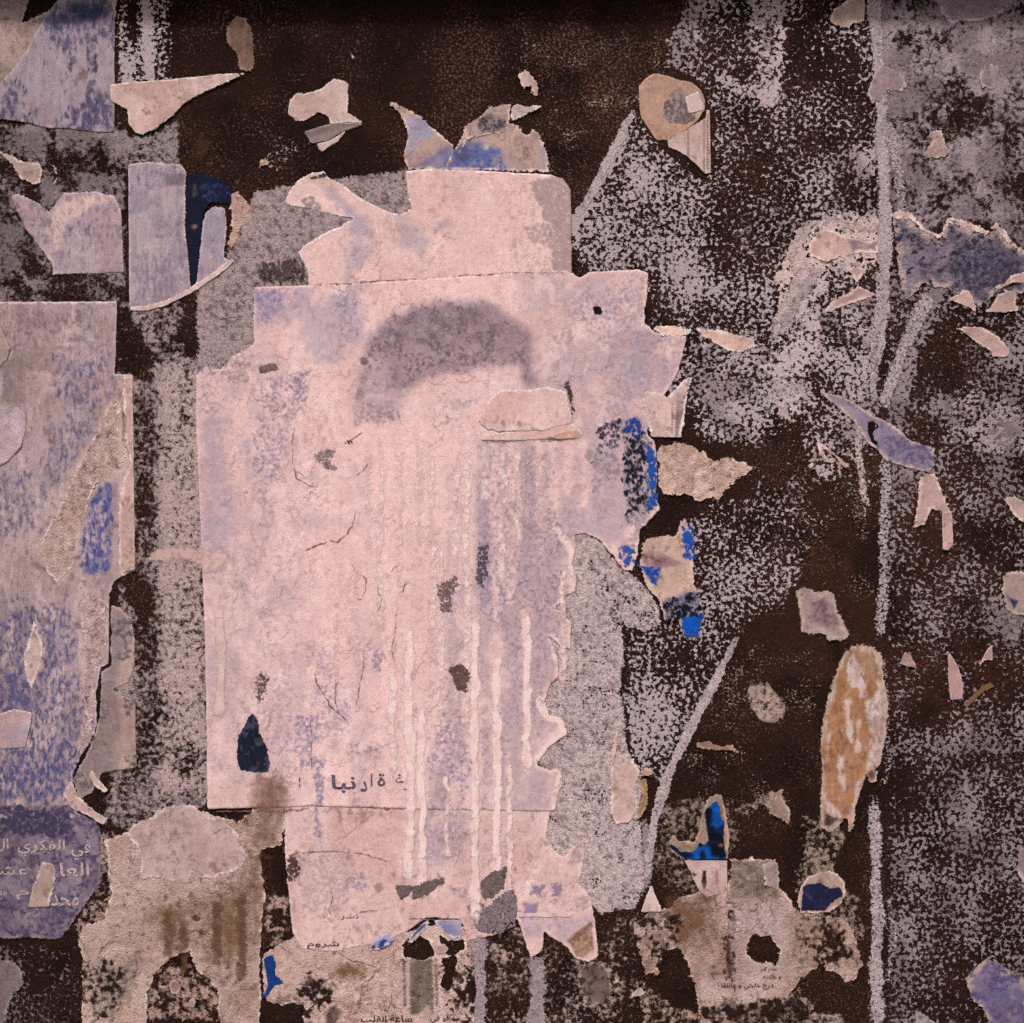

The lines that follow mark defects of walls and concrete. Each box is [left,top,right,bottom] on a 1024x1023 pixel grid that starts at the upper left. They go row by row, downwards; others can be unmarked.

leakage [558,570,567,686]
leakage [364,441,543,1023]
leakage [213,885,257,978]
peeling [631,905,683,967]
peeling [798,917,858,972]
peeling [696,996,807,1023]